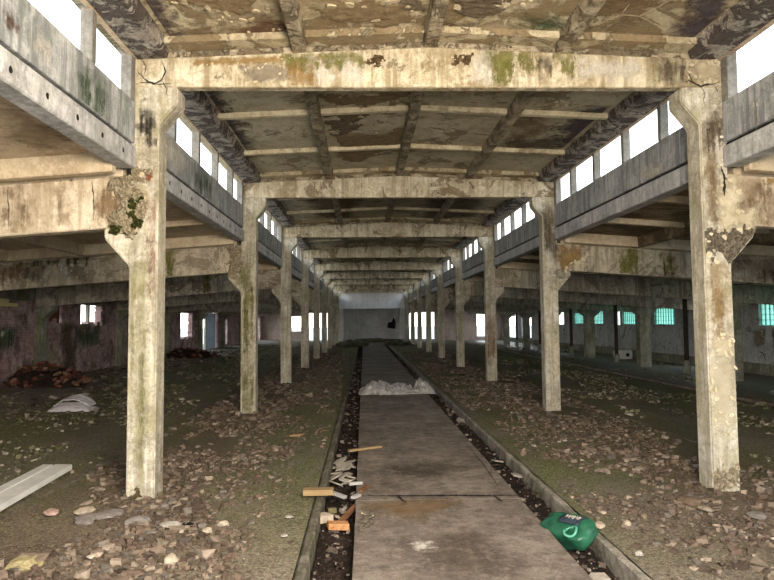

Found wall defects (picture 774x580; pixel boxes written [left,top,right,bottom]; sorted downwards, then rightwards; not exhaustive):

damp [230,22,287,33]
damp [607,0,659,30]
damp [671,0,727,37]
crack [138,59,169,93]
spalling [365,55,386,67]
spalling [451,53,474,67]
damp [473,50,639,86]
crack [686,74,719,102]
damp [138,110,157,144]
spalling [106,166,151,240]
peeling [705,131,759,266]